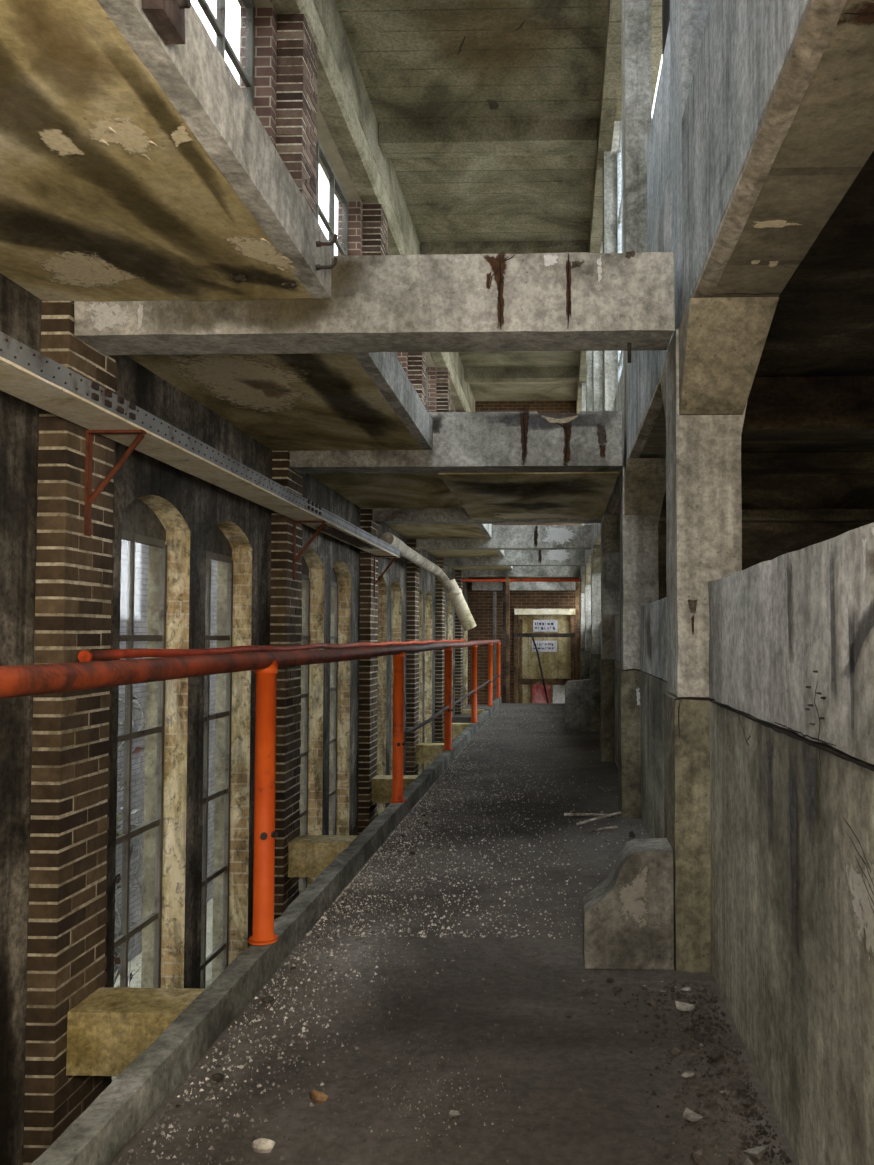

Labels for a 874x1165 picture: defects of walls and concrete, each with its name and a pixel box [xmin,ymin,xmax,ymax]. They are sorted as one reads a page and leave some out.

peeling [38,129,84,157]
peeling [88,116,157,160]
peeling [171,125,193,147]
water stain [0,204,355,324]
rust [484,253,508,289]
water stain [862,526,874,587]
water stain [830,556,874,741]